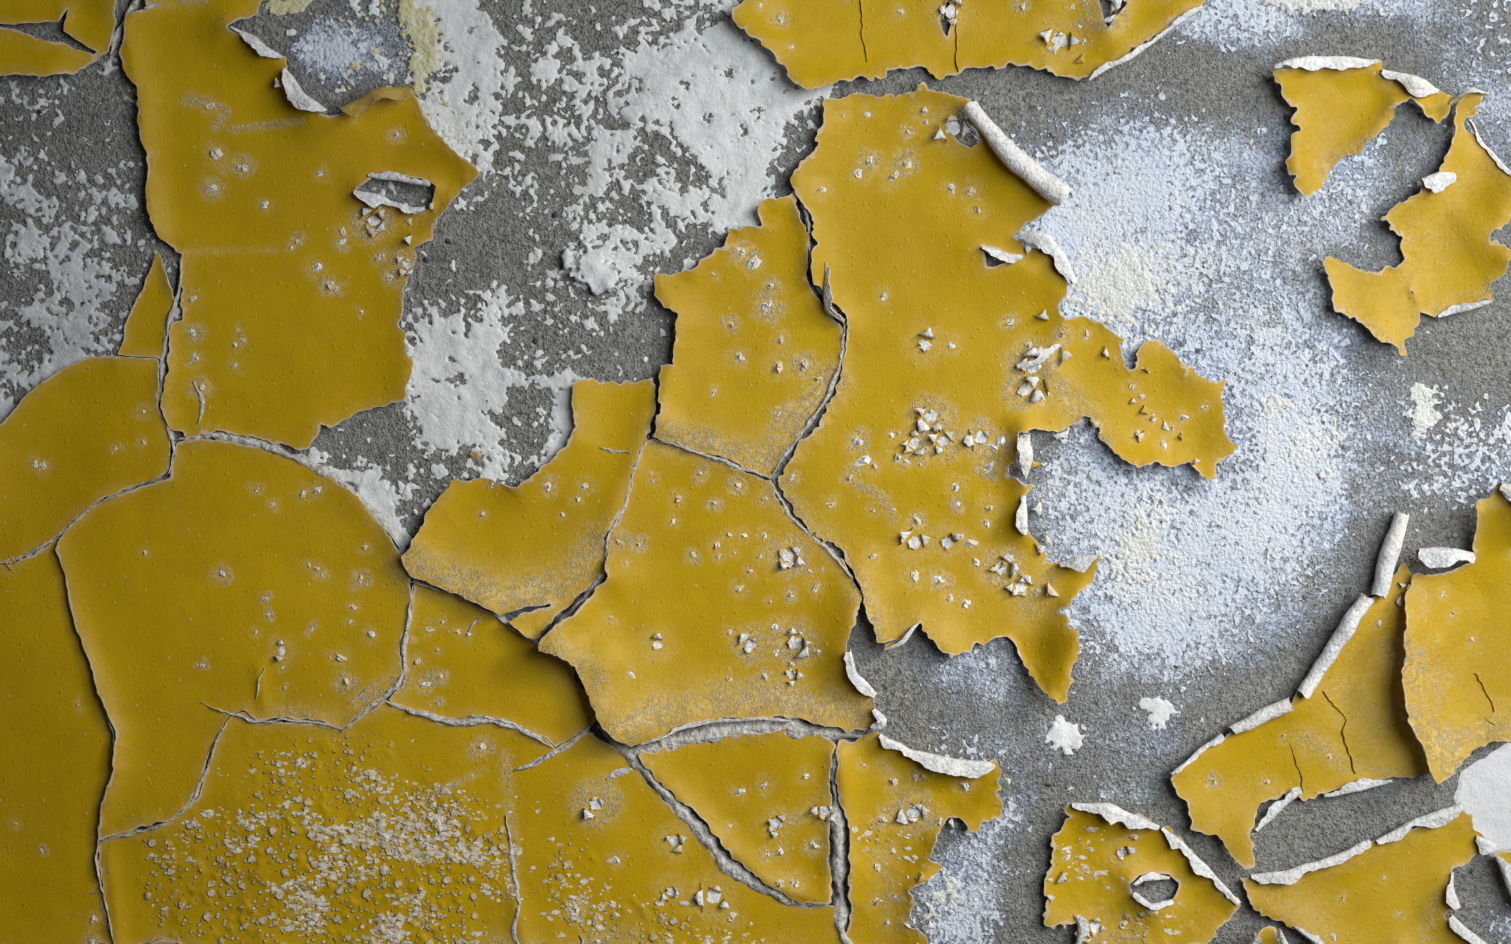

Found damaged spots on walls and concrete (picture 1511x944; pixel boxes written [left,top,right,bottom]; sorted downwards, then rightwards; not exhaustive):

peeling [0,0,842,944]
crack [0,197,862,944]
peeling [389,82,1237,944]
peeling [732,0,1205,90]
peeling [1043,482,1511,944]
peeling [1273,56,1511,356]